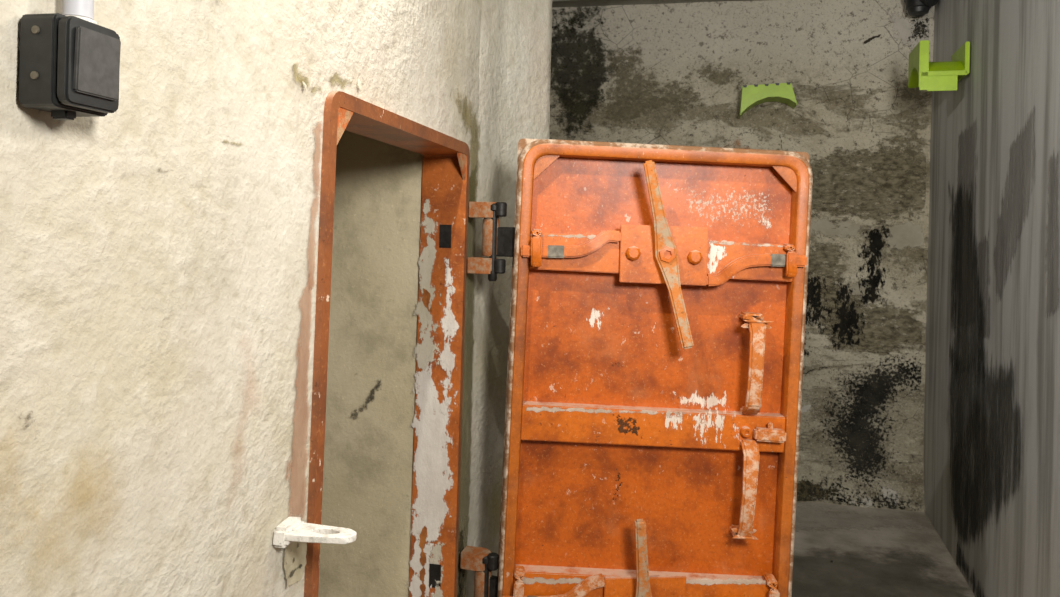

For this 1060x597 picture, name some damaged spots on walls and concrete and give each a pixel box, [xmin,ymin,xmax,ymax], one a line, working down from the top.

water stain [550,6,742,140]
water stain [874,72,925,198]
water stain [804,225,892,355]
peeling [408,199,459,597]
water stain [798,350,922,511]
water stain [949,184,1023,597]